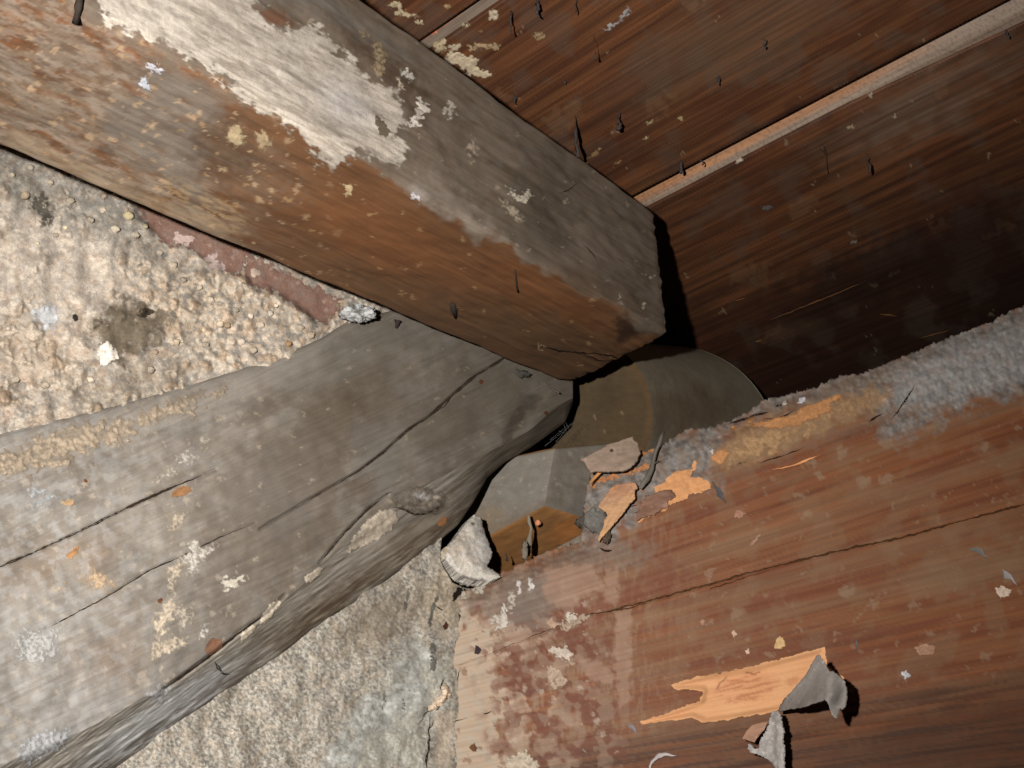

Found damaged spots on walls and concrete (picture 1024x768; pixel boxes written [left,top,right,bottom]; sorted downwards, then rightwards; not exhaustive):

peeling [637,490,676,521]
crack [417,505,1022,767]
peeling [640,647,848,768]